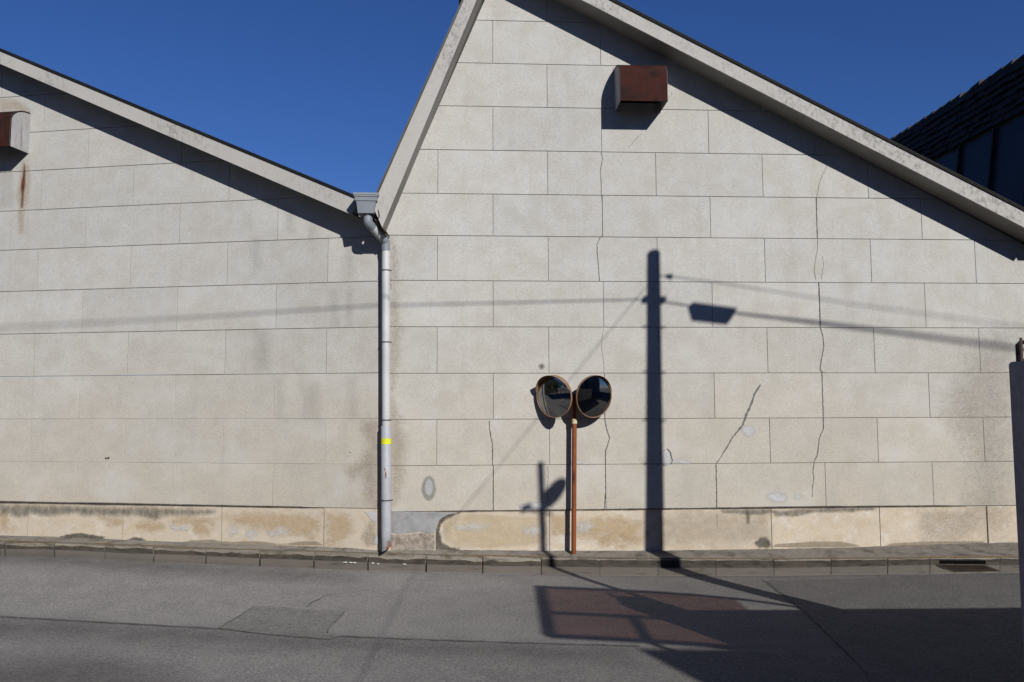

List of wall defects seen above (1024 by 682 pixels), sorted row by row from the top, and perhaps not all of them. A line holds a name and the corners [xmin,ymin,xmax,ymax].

crack [597,152,605,378]
crack [812,166,827,497]
leakage [0,501,284,517]
crack [603,413,611,510]
leakage [436,505,949,550]
crack [716,384,761,525]